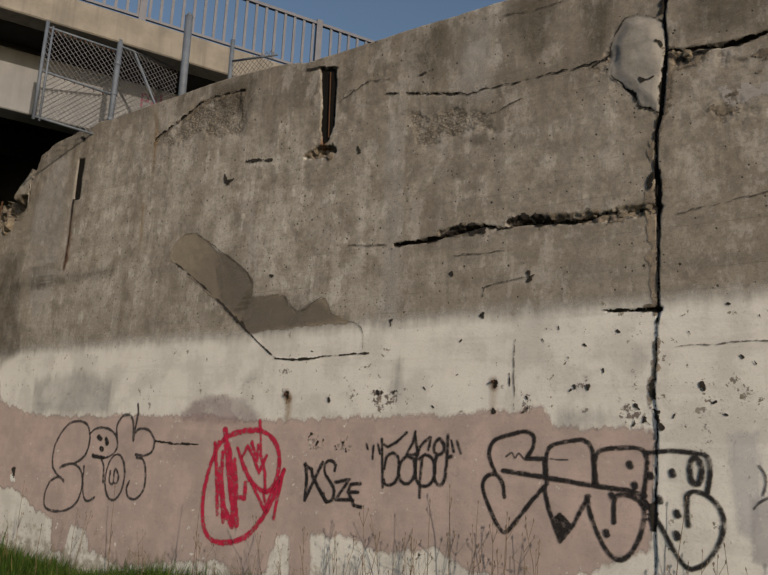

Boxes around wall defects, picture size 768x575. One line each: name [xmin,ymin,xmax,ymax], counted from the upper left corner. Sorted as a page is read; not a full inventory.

crack [154,89,247,146]
spalling [0,194,30,236]
crack [64,199,75,266]
peeling [171,233,349,334]
crack [340,0,768,567]